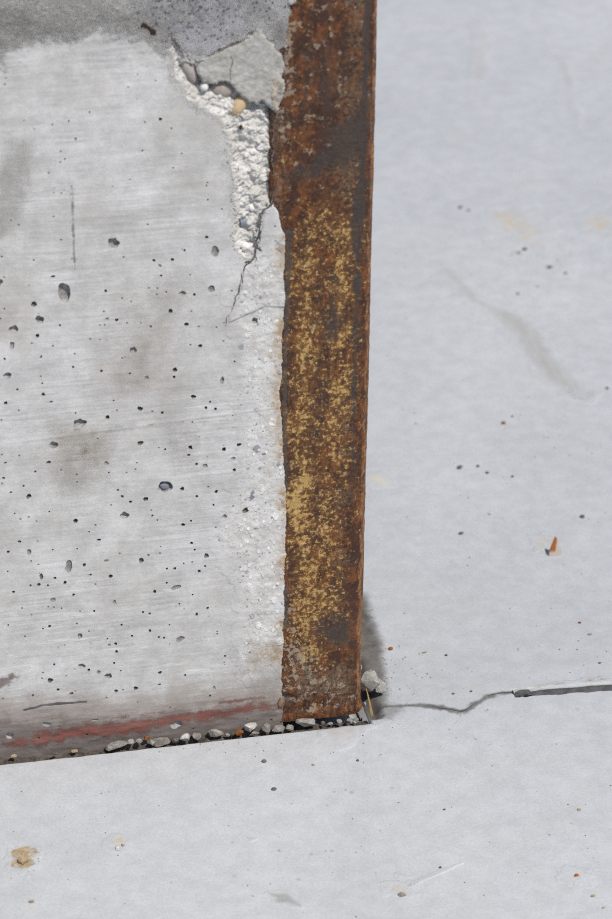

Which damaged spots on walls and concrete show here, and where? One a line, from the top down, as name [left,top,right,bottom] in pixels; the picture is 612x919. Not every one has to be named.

crack [225,202,274,326]
peeling [0,0,291,689]
crack [379,692,512,713]